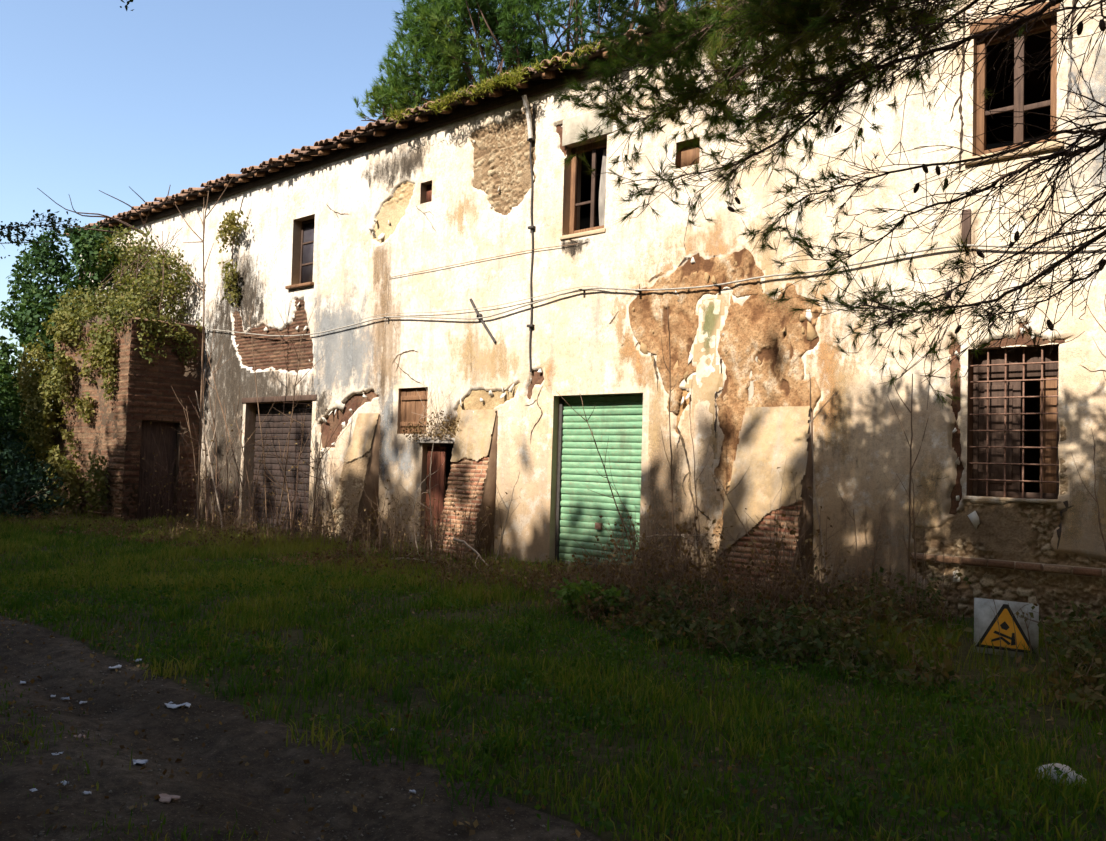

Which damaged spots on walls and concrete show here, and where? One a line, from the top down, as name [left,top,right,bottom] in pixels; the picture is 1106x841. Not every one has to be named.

spalling [470,105,537,215]
flaking render [369,181,415,243]
spalling [232,298,314,373]
spalling [321,390,380,448]
spalling [438,369,544,438]
flaking render [628,248,823,554]
spalling [912,495,1106,630]